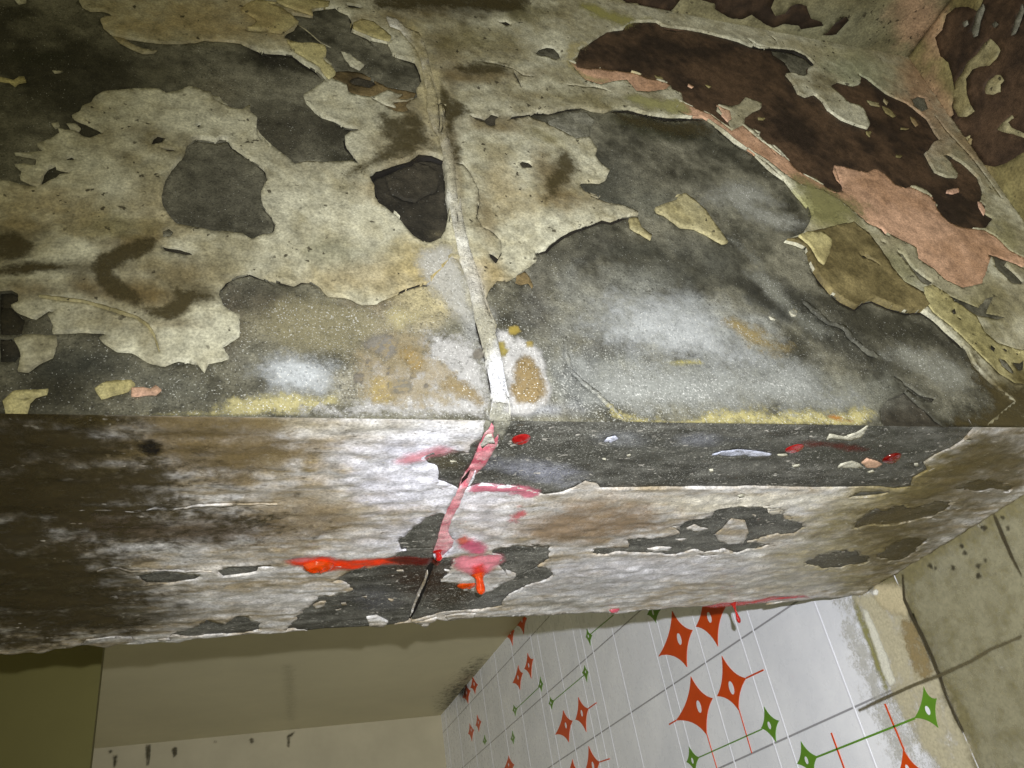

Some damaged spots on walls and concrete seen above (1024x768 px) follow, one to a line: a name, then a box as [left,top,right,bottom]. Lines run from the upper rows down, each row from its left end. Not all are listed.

crack [386,16,511,619]
peeling [0,0,1024,556]
water stain [0,302,551,650]
peeling [139,571,199,583]
peeling [158,616,260,642]
peeling [219,566,263,576]
peeling [288,514,553,630]
peeling [805,538,927,568]